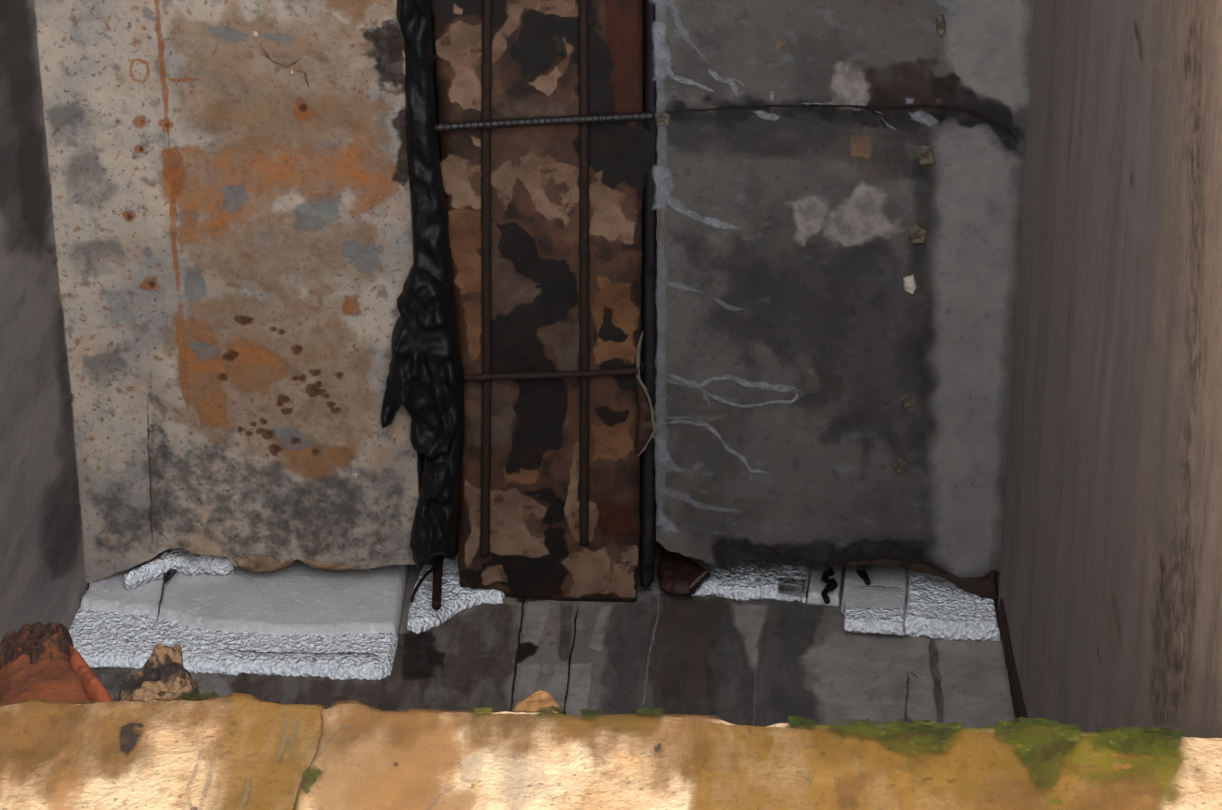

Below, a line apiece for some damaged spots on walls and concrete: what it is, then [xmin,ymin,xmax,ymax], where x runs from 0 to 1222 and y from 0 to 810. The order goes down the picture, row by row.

peeling [436,0,579,116]
crack [667,93,1014,137]
peeling [440,152,640,371]
water stain [60,311,74,446]
water stain [674,375,798,407]
water stain [46,468,81,573]
mould [96,425,403,561]
peeling [464,417,638,598]
water stain [0,488,1183,810]